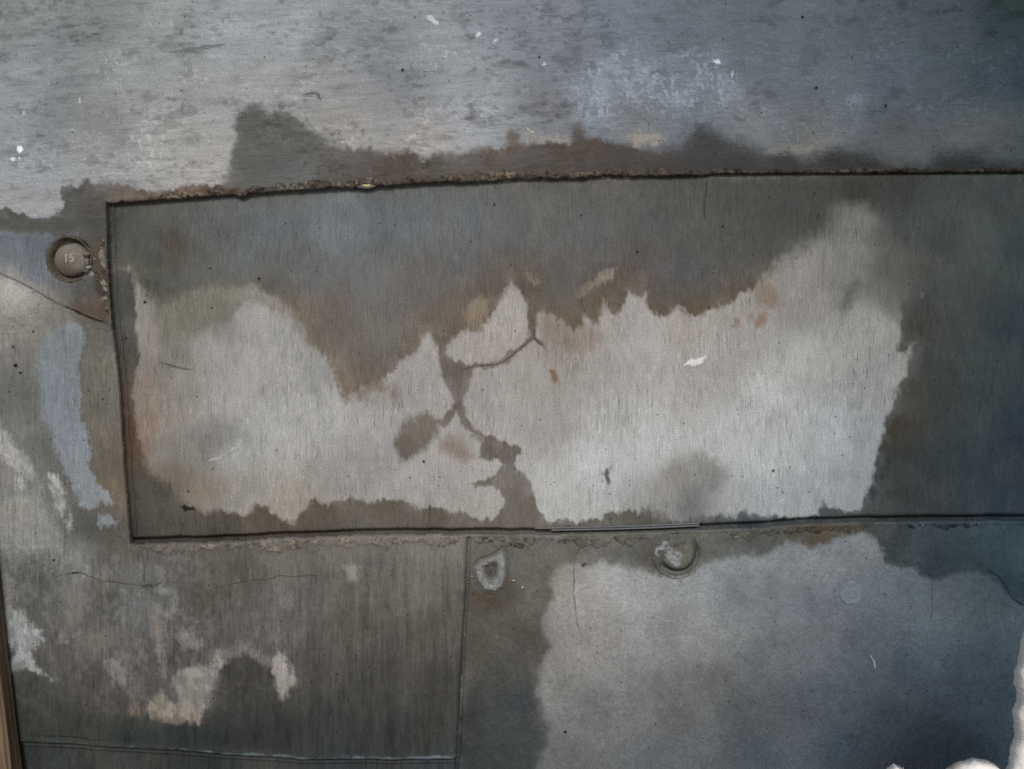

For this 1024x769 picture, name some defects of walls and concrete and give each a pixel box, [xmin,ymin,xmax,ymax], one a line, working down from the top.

water stain [10,264,578,769]
water stain [0,97,1024,614]
water stain [391,29,1024,177]